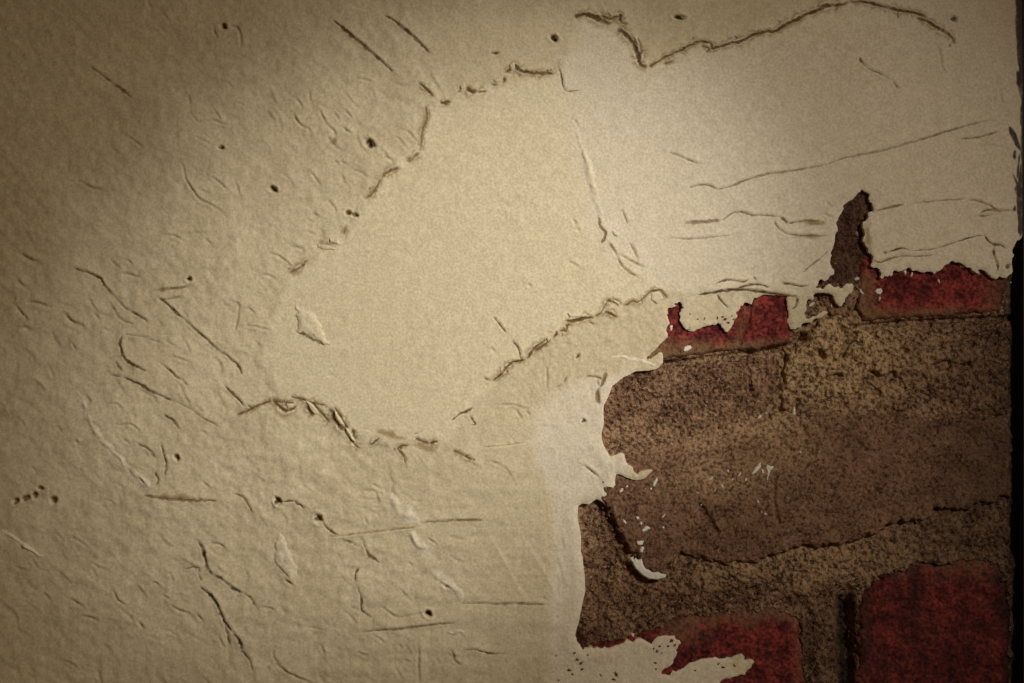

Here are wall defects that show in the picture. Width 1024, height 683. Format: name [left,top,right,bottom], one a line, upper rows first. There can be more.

crack [576,1,954,67]
crack [367,62,564,197]
crack [293,238,339,271]
crack [951,237,1004,270]
crack [486,287,666,380]
flaking render [558,0,1023,683]
crack [225,354,472,459]